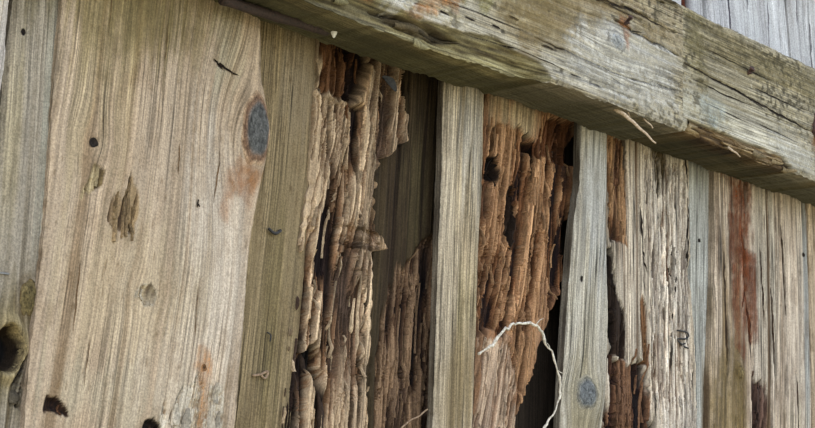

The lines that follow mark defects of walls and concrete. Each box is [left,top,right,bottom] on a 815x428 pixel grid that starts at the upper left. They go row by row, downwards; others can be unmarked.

crack [415,0,676,91]
crack [596,0,813,141]
spalling [606,254,626,358]
spalling [637,296,647,365]
spalling [294,335,324,428]